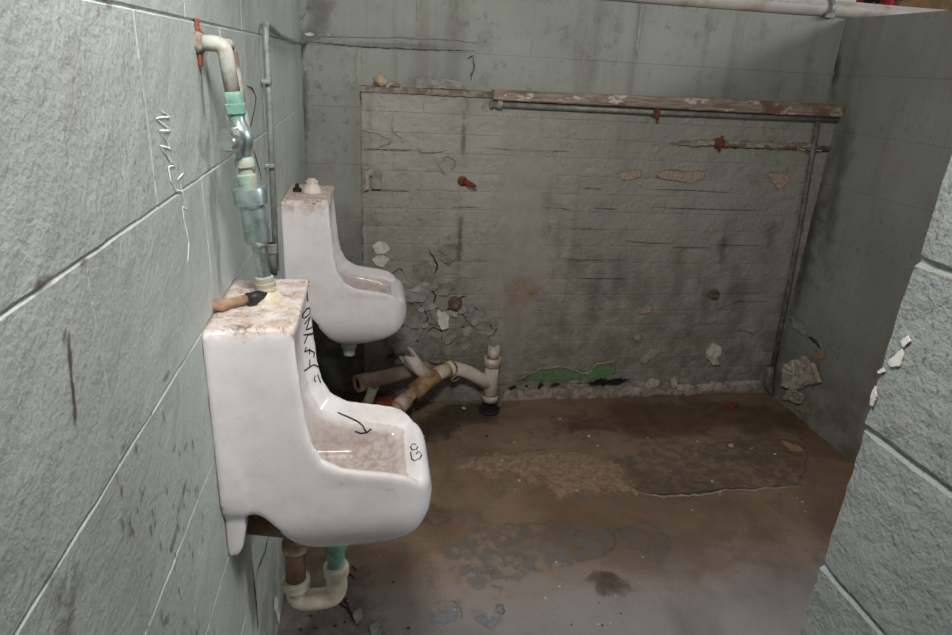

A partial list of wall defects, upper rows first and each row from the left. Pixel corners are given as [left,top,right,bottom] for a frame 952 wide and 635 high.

peeling [384,243,497,365]
flaking render [705,342,722,365]
spalling [877,336,912,374]
peeling [509,361,630,391]